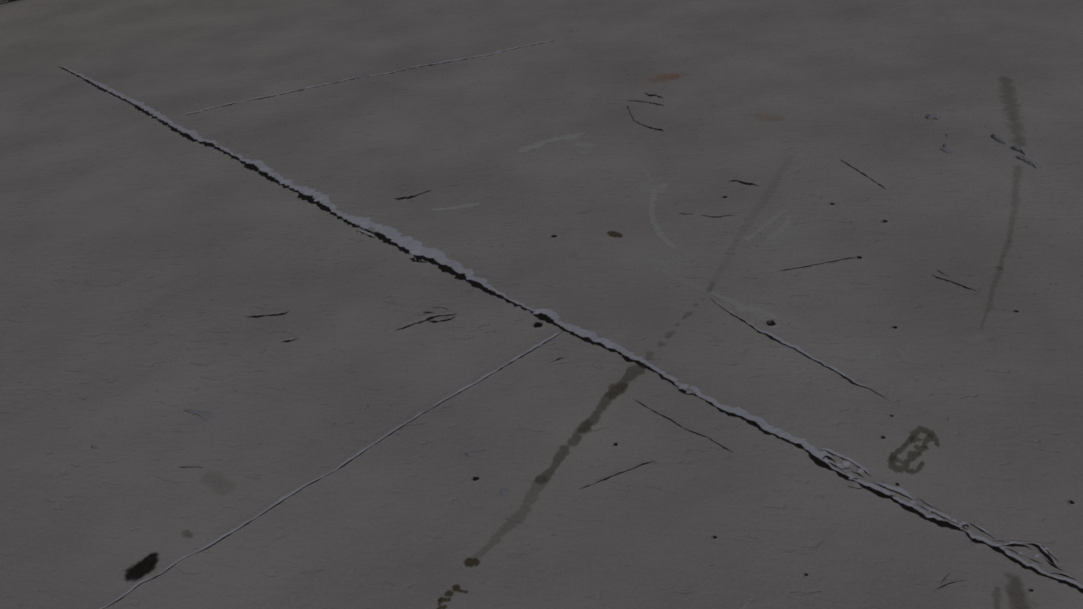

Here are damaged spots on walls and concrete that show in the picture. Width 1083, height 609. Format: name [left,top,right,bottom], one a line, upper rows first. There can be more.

crack [57,65,945,521]
crack [932,268,980,292]
crack [88,331,563,609]
crack [699,397,1083,596]